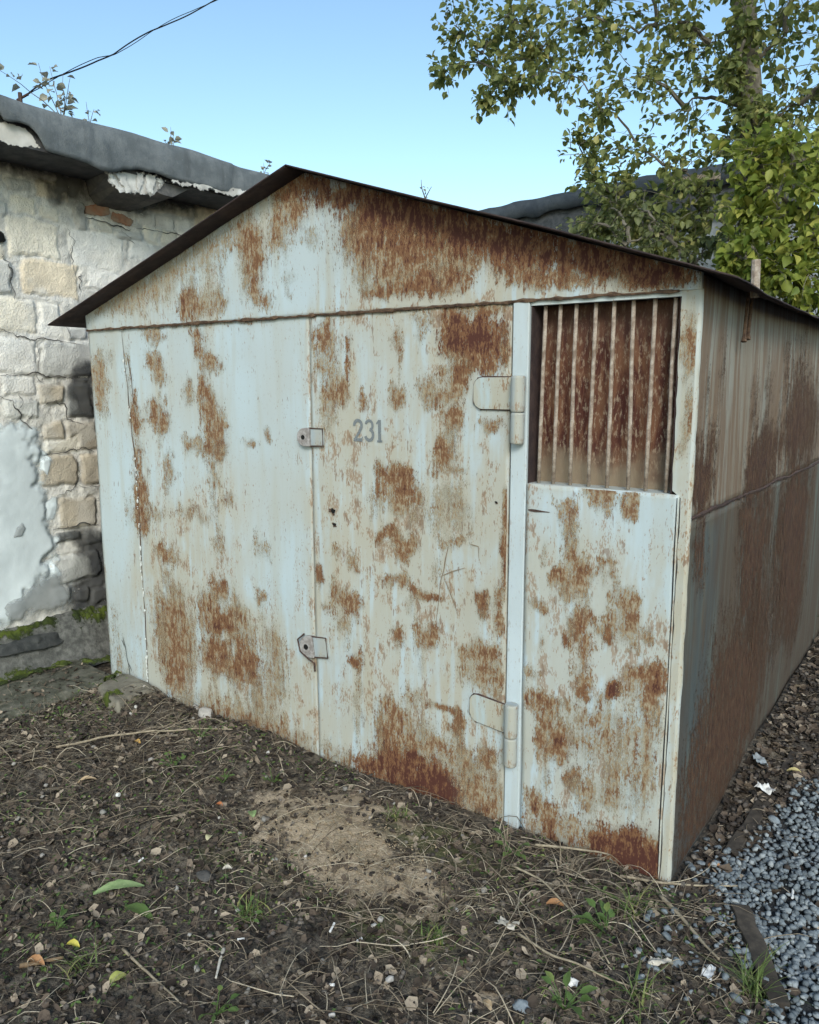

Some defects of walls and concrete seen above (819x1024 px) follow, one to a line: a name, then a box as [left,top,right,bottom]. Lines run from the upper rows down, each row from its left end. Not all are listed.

spalling [0,121,40,148]
spalling [105,171,245,197]
peeling [0,420,61,628]
rust [88,173,701,879]
rust [679,310,727,596]
rust [743,319,819,508]